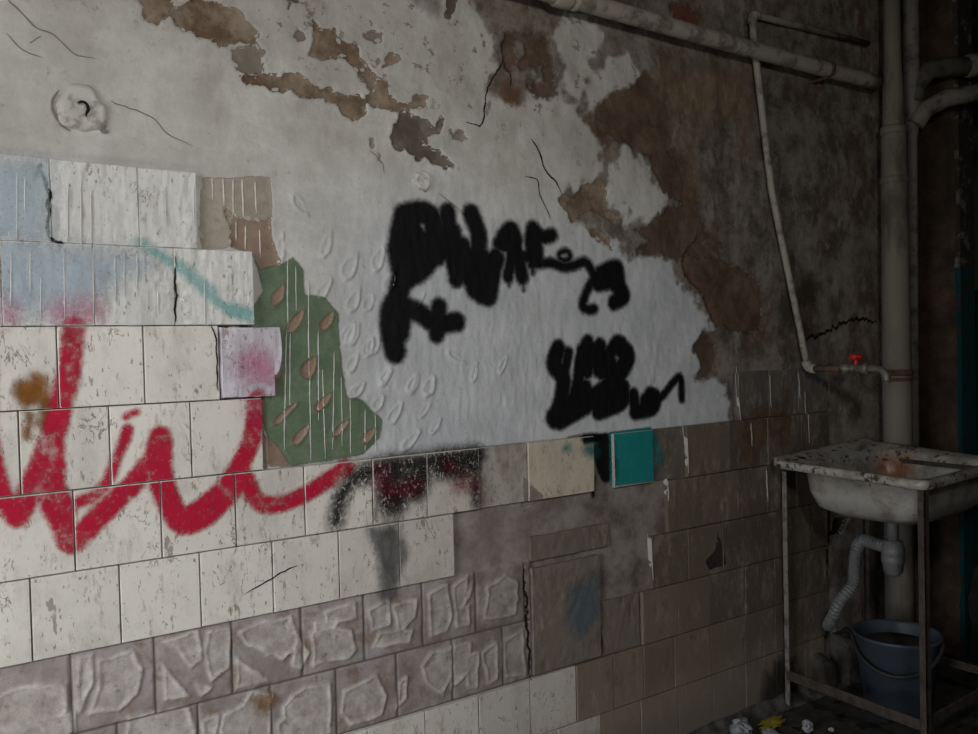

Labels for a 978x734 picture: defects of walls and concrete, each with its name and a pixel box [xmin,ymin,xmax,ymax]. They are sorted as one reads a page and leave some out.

flaking render [139,0,467,170]
flaking render [501,30,558,100]
flaking render [558,178,619,224]
flaking render [590,229,613,250]
flaking render [595,71,765,380]
crack [806,316,876,341]